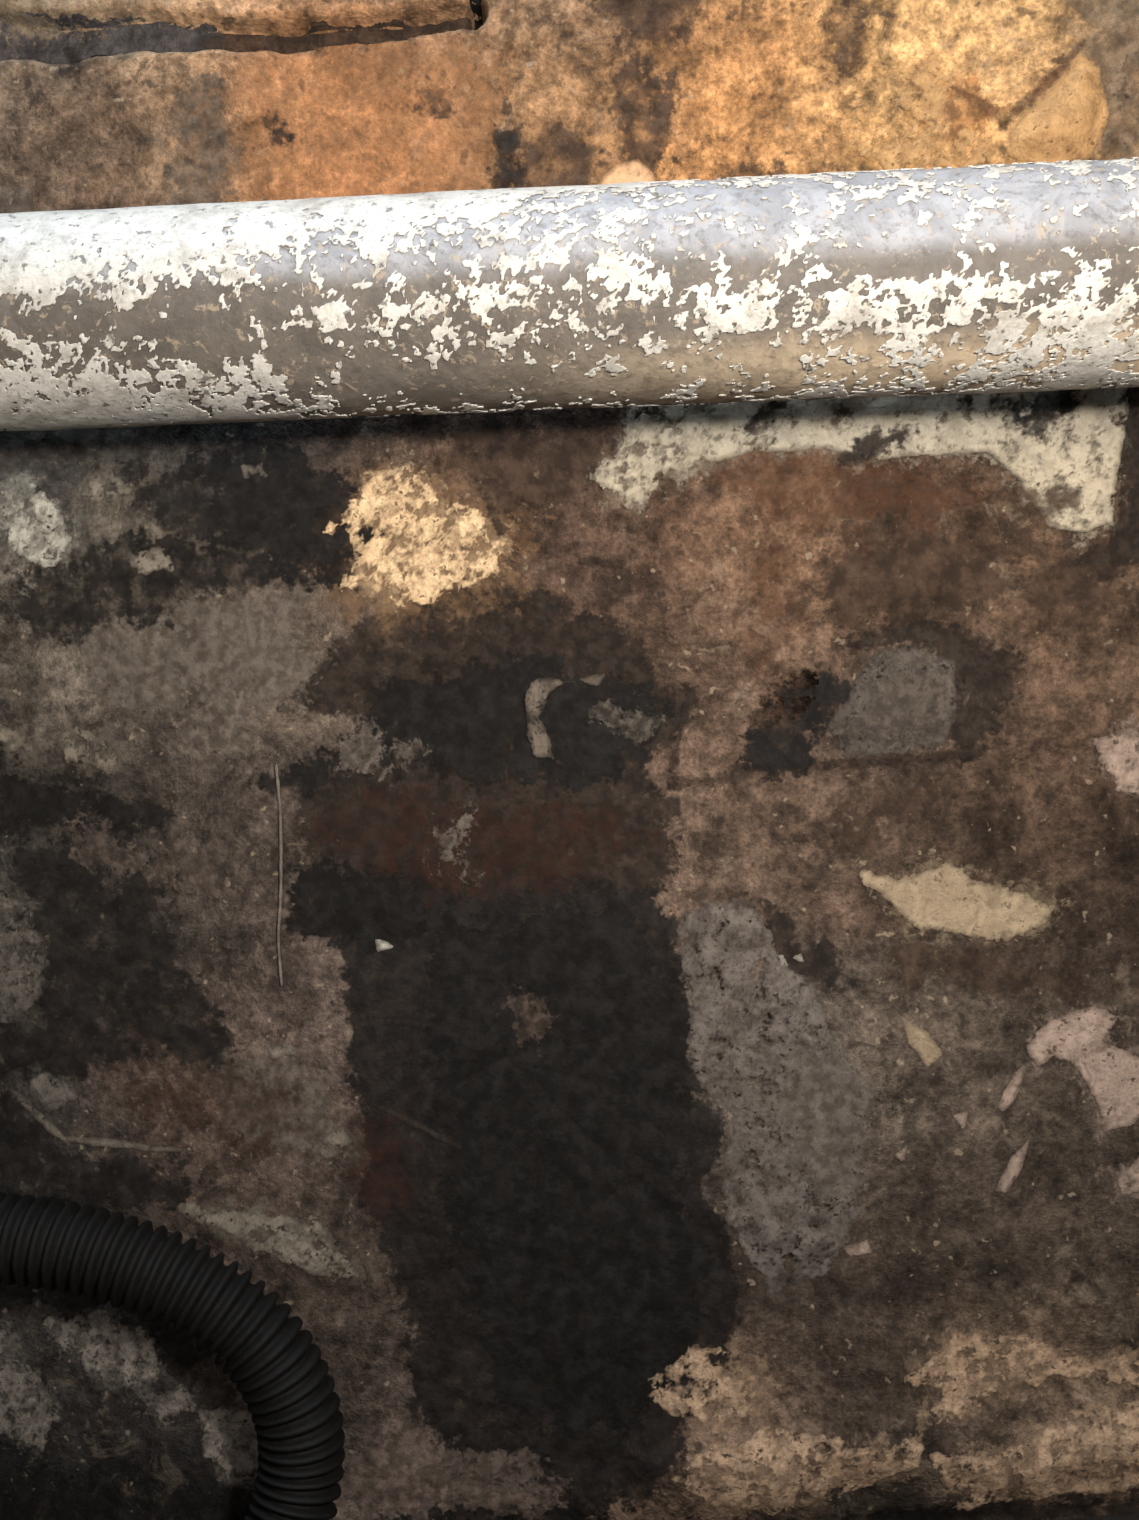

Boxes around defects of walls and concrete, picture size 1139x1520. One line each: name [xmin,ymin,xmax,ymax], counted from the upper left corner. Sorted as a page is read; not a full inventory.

peeling [0,53,1139,547]
peeling [122,550,173,573]
peeling [80,586,323,764]
peeling [323,464,511,616]
damp [736,669,857,782]
damp [820,404,1139,860]
damp [744,891,858,991]
peeling [857,848,1069,948]
damp [247,572,743,1520]
damp [843,1487,1139,1520]